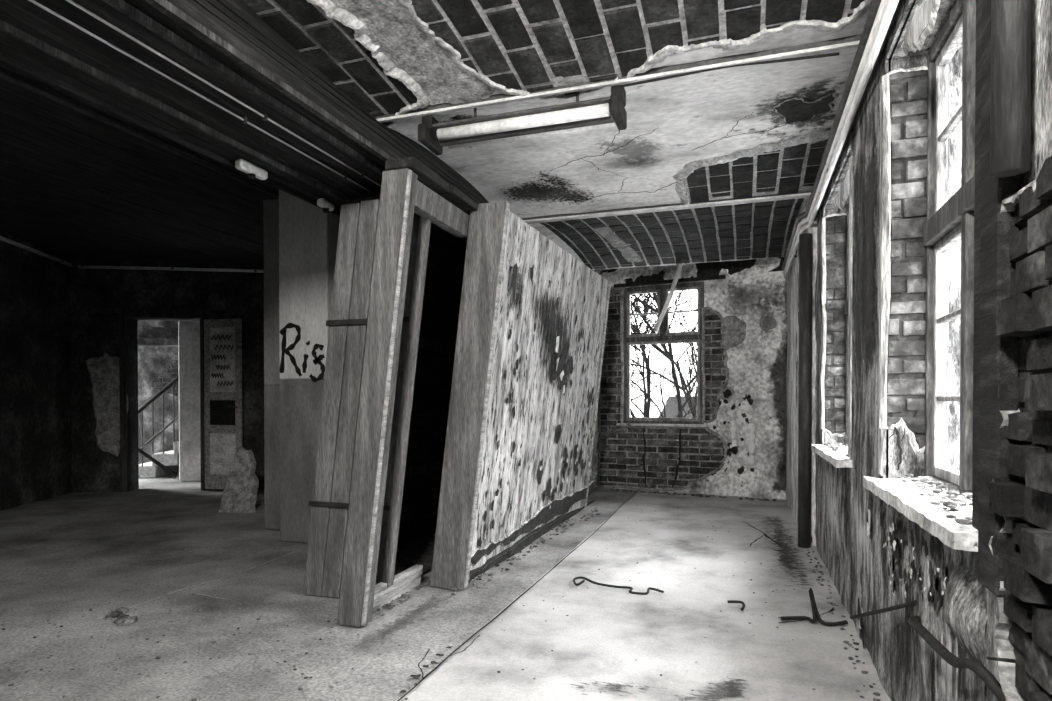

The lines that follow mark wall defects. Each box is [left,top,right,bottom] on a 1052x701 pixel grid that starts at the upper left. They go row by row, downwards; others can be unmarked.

flaking render [238,0,873,130]
damp [750,78,843,140]
damp [500,171,600,205]
flaking render [540,90,839,270]
flaking render [878,0,940,476]
damp [507,263,571,394]
flaking render [468,286,754,583]
flaking render [986,156,1052,701]
damp [826,470,883,607]
damp [930,632,958,701]